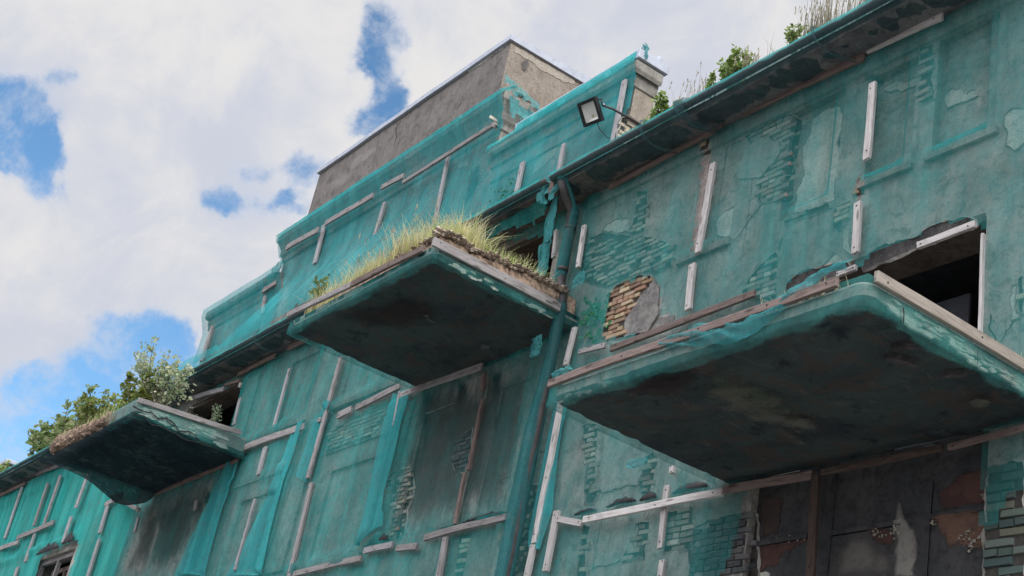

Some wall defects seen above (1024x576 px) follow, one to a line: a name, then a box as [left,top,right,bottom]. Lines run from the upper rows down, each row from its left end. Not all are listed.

flaking render [883,43,979,110]
flaking render [745,106,864,268]
flaking render [579,189,677,341]
flaking render [742,253,782,305]
flaking render [387,463,416,542]
damp [403,373,521,515]
flaking render [663,505,770,576]
flaking render [929,458,1024,576]